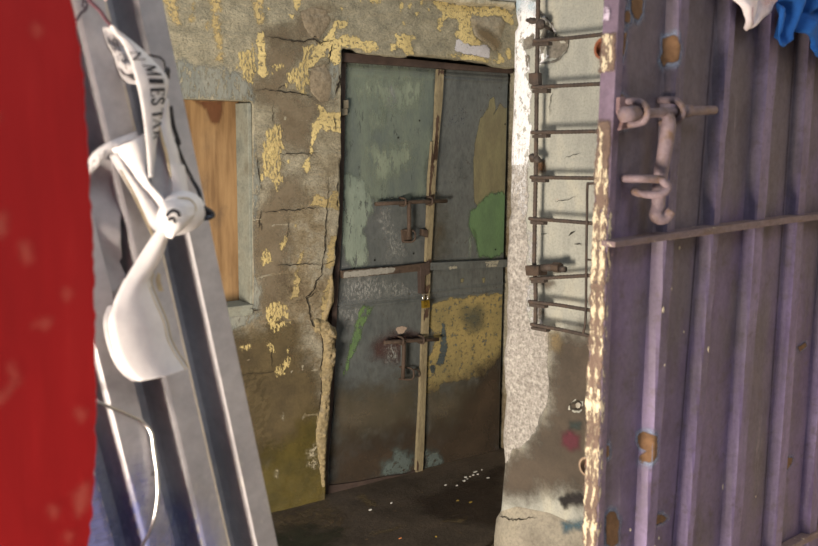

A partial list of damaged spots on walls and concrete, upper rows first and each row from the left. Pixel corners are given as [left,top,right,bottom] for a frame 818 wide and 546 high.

crack [255,36,341,121]
peeling [236,0,379,94]
peeling [390,22,416,56]
peeling [260,124,289,191]
peeling [302,105,341,173]
peeling [310,191,340,210]
spalling [399,0,569,463]
peeling [266,250,304,333]
crack [258,177,338,427]
water stain [232,321,321,465]
spalling [313,235,337,487]
water stain [418,330,590,525]